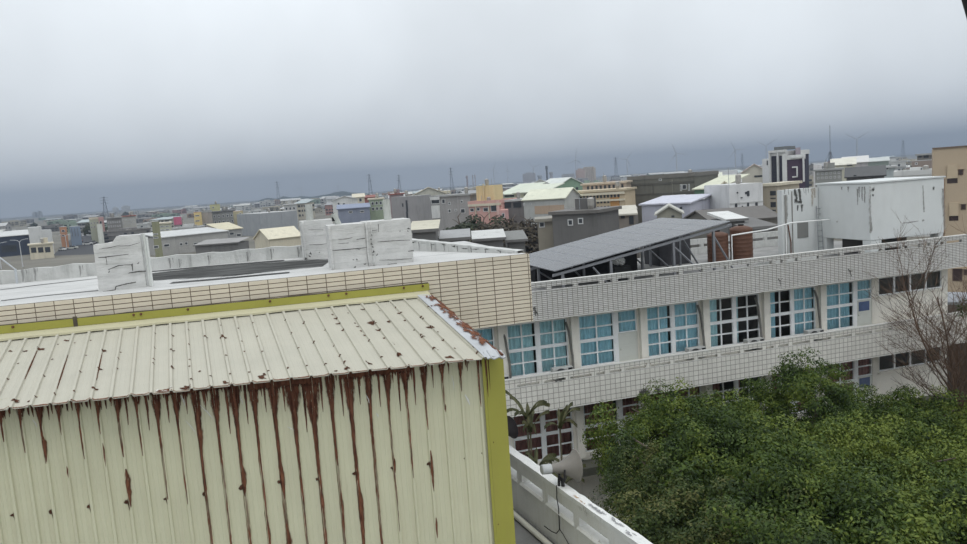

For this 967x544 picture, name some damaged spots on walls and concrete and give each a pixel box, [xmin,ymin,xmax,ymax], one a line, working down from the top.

rust [0,295,490,544]